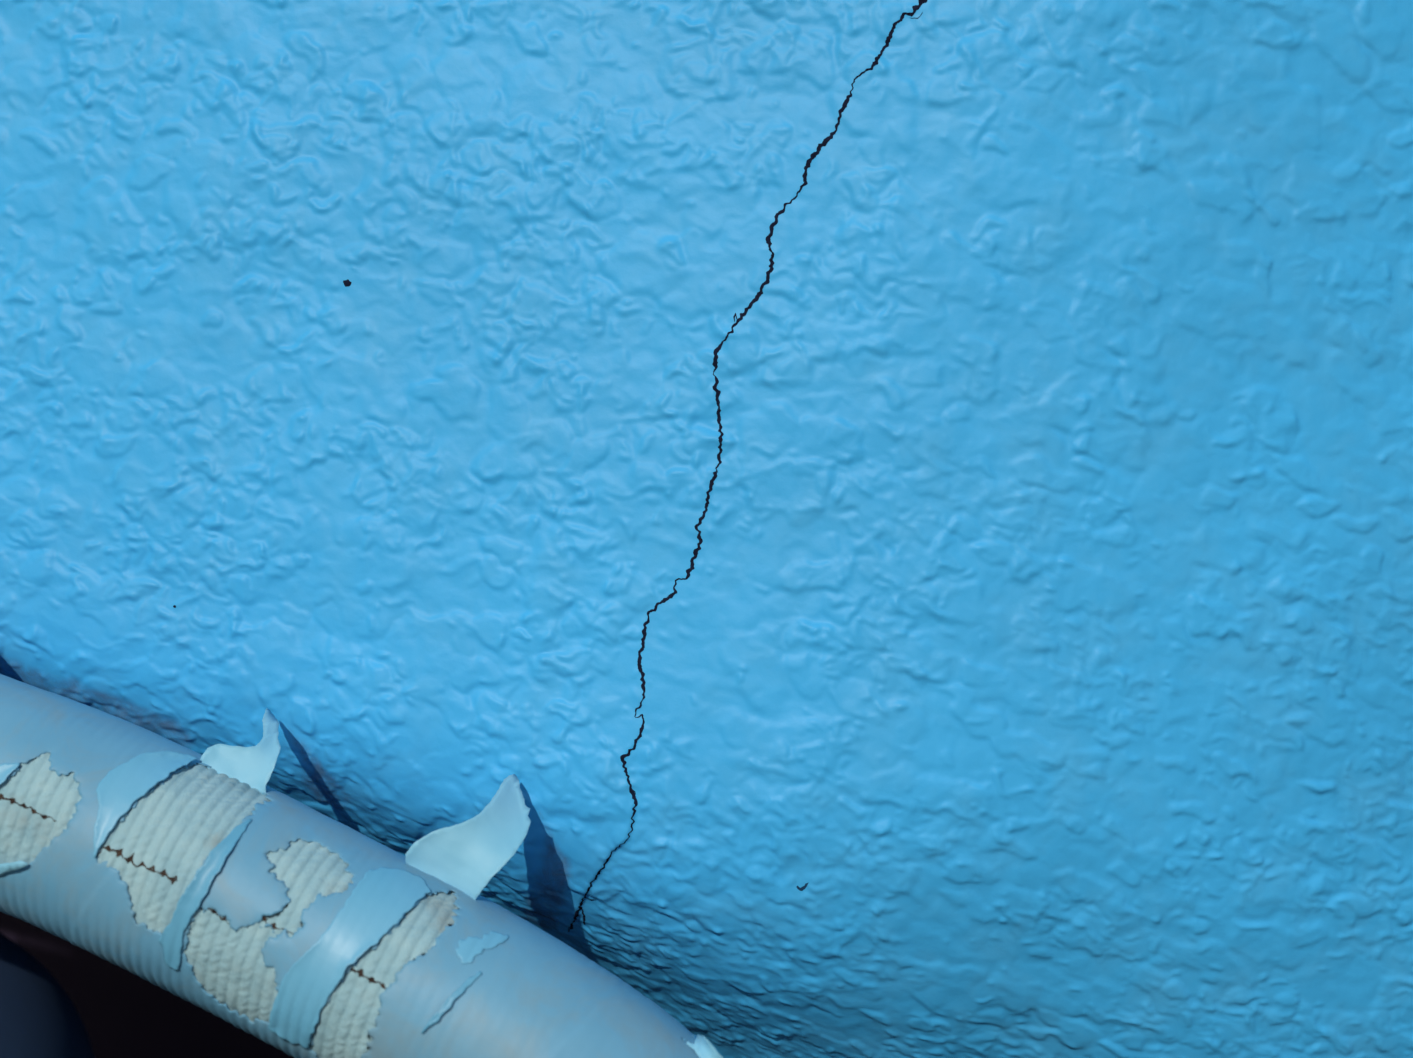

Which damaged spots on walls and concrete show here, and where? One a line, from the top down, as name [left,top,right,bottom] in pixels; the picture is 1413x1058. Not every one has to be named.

crack [568,0,927,932]